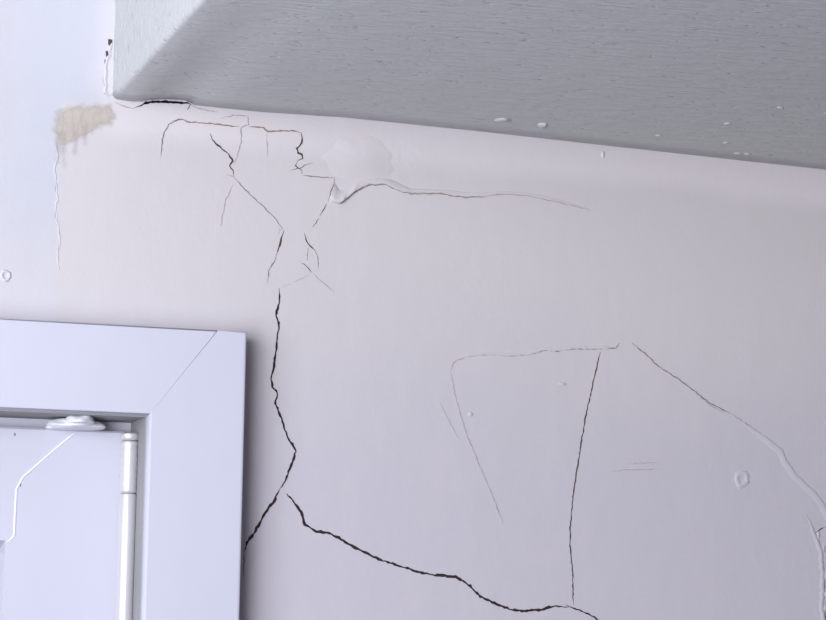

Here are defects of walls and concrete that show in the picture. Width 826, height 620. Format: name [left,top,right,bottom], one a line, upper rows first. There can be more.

crack [115,100,761,620]